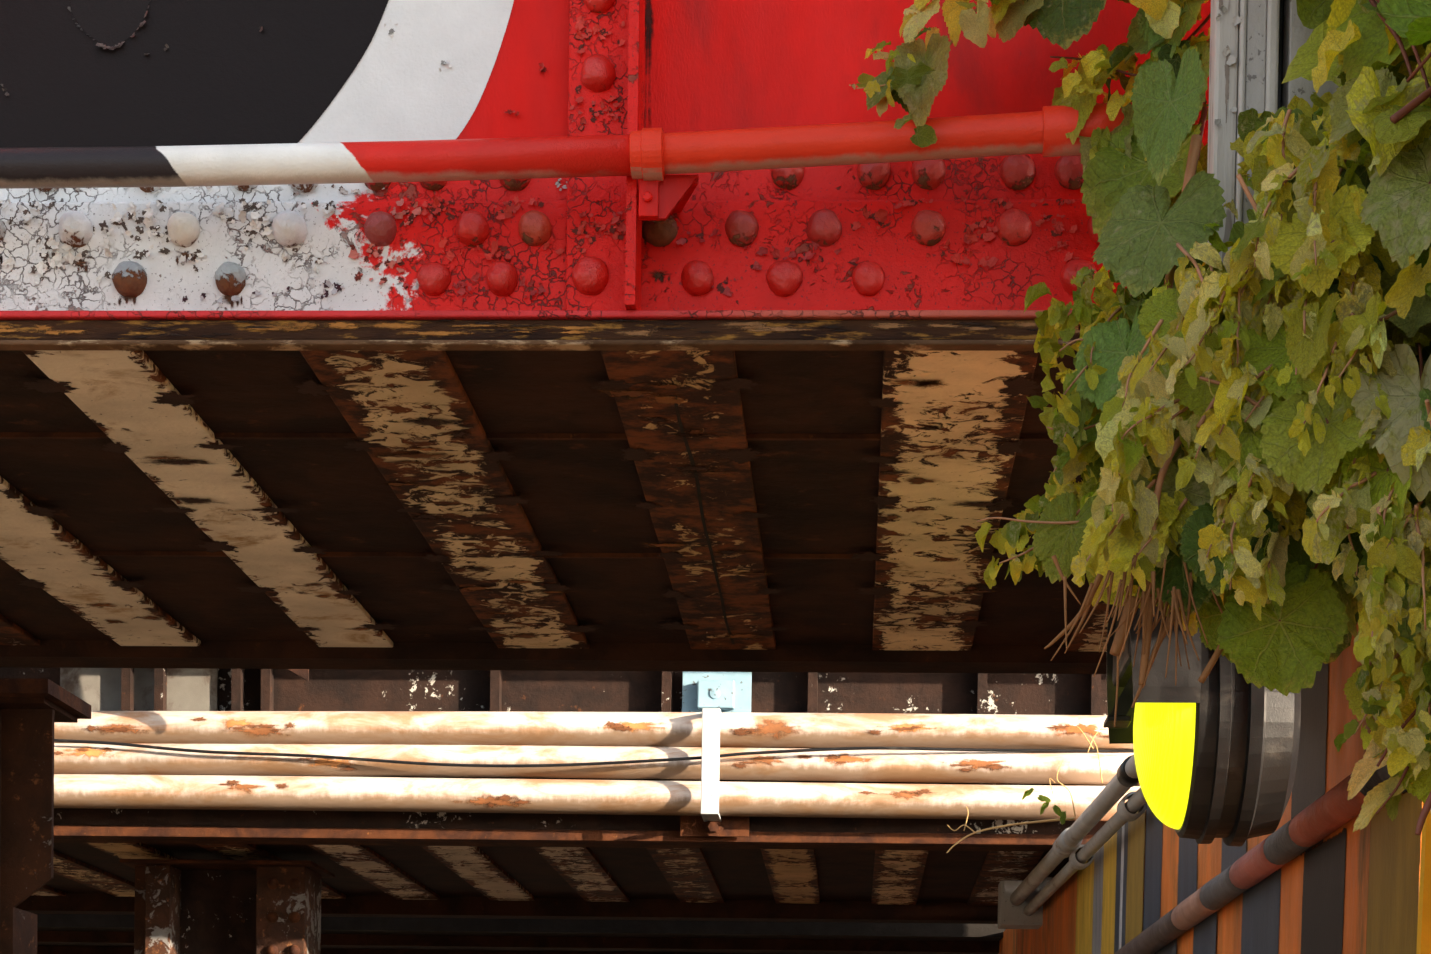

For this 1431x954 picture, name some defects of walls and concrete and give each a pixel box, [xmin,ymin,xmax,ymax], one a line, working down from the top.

peeling [206,184,385,251]
peeling [390,196,455,227]
peeling [0,199,207,284]
peeling [281,239,417,299]
peeling [711,239,859,296]
peeling [167,286,291,304]
corrosion [54,724,149,759]
corrosion [731,720,798,739]
corrosion [1047,723,1109,737]
corrosion [732,754,873,769]
corrosion [951,759,1009,772]
corrosion [453,794,530,808]